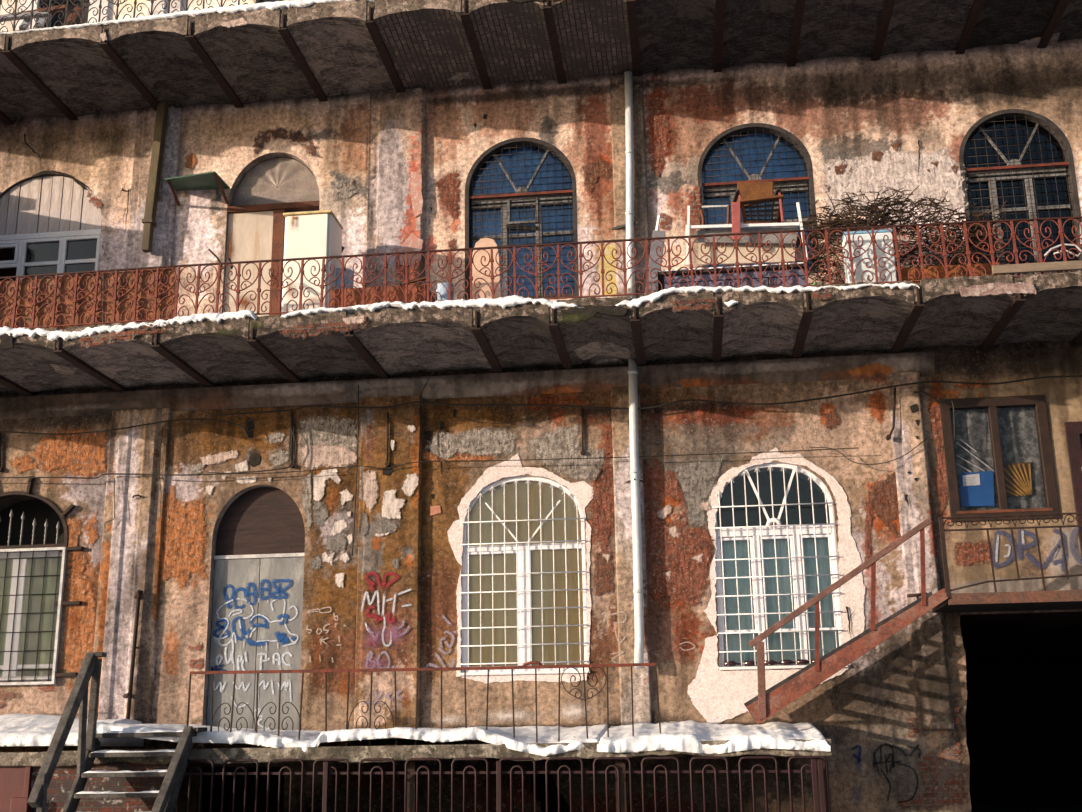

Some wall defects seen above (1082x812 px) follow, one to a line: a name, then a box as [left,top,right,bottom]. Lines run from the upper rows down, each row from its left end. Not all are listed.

flaking render [253,127,320,157]
peeling [8,428,108,478]
peeling [823,408,841,429]
peeling [909,384,983,513]
peeling [160,414,419,590]
peeling [407,409,615,684]
peeling [647,448,917,724]
flaking render [189,642,203,669]
flaking render [894,742,969,811]